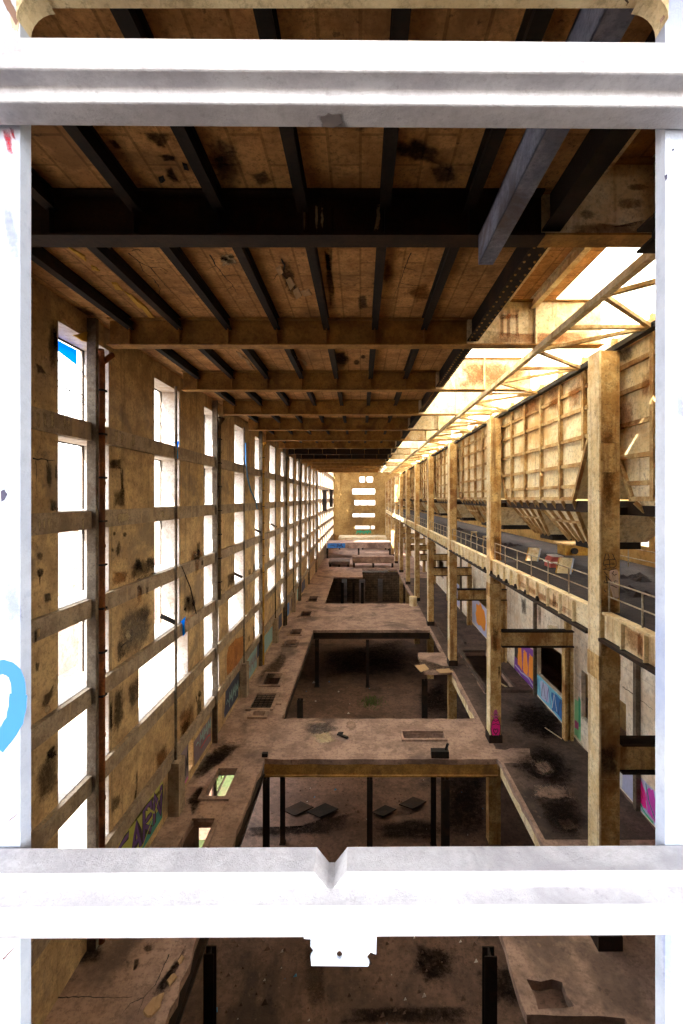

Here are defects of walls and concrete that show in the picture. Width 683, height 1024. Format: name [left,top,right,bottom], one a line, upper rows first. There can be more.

spalling [321,113,344,128]
water stain [397,139,456,182]
spalling [274,259,312,299]
water stain [110,459,129,556]
water stain [118,606,151,661]